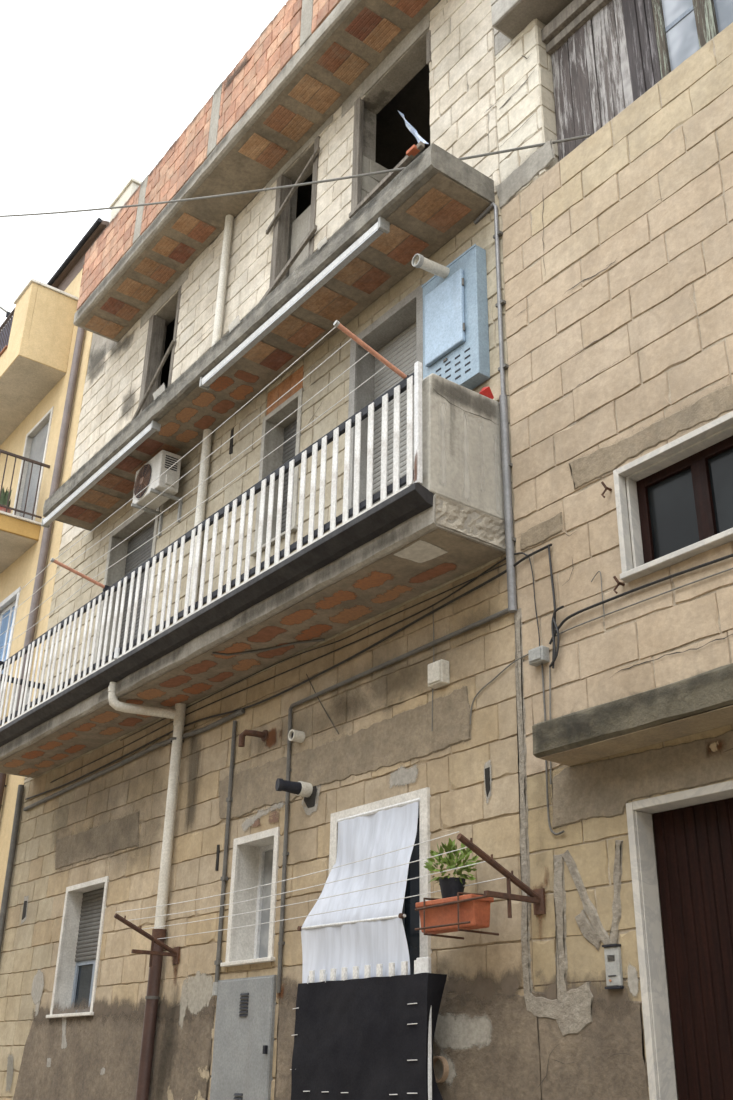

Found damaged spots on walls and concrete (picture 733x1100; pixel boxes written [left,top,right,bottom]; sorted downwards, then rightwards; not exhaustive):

water stain [54,366,194,494]
crack [615,634,733,674]
flaking render [179,971,213,1028]
peeling [434,1013,491,1084]